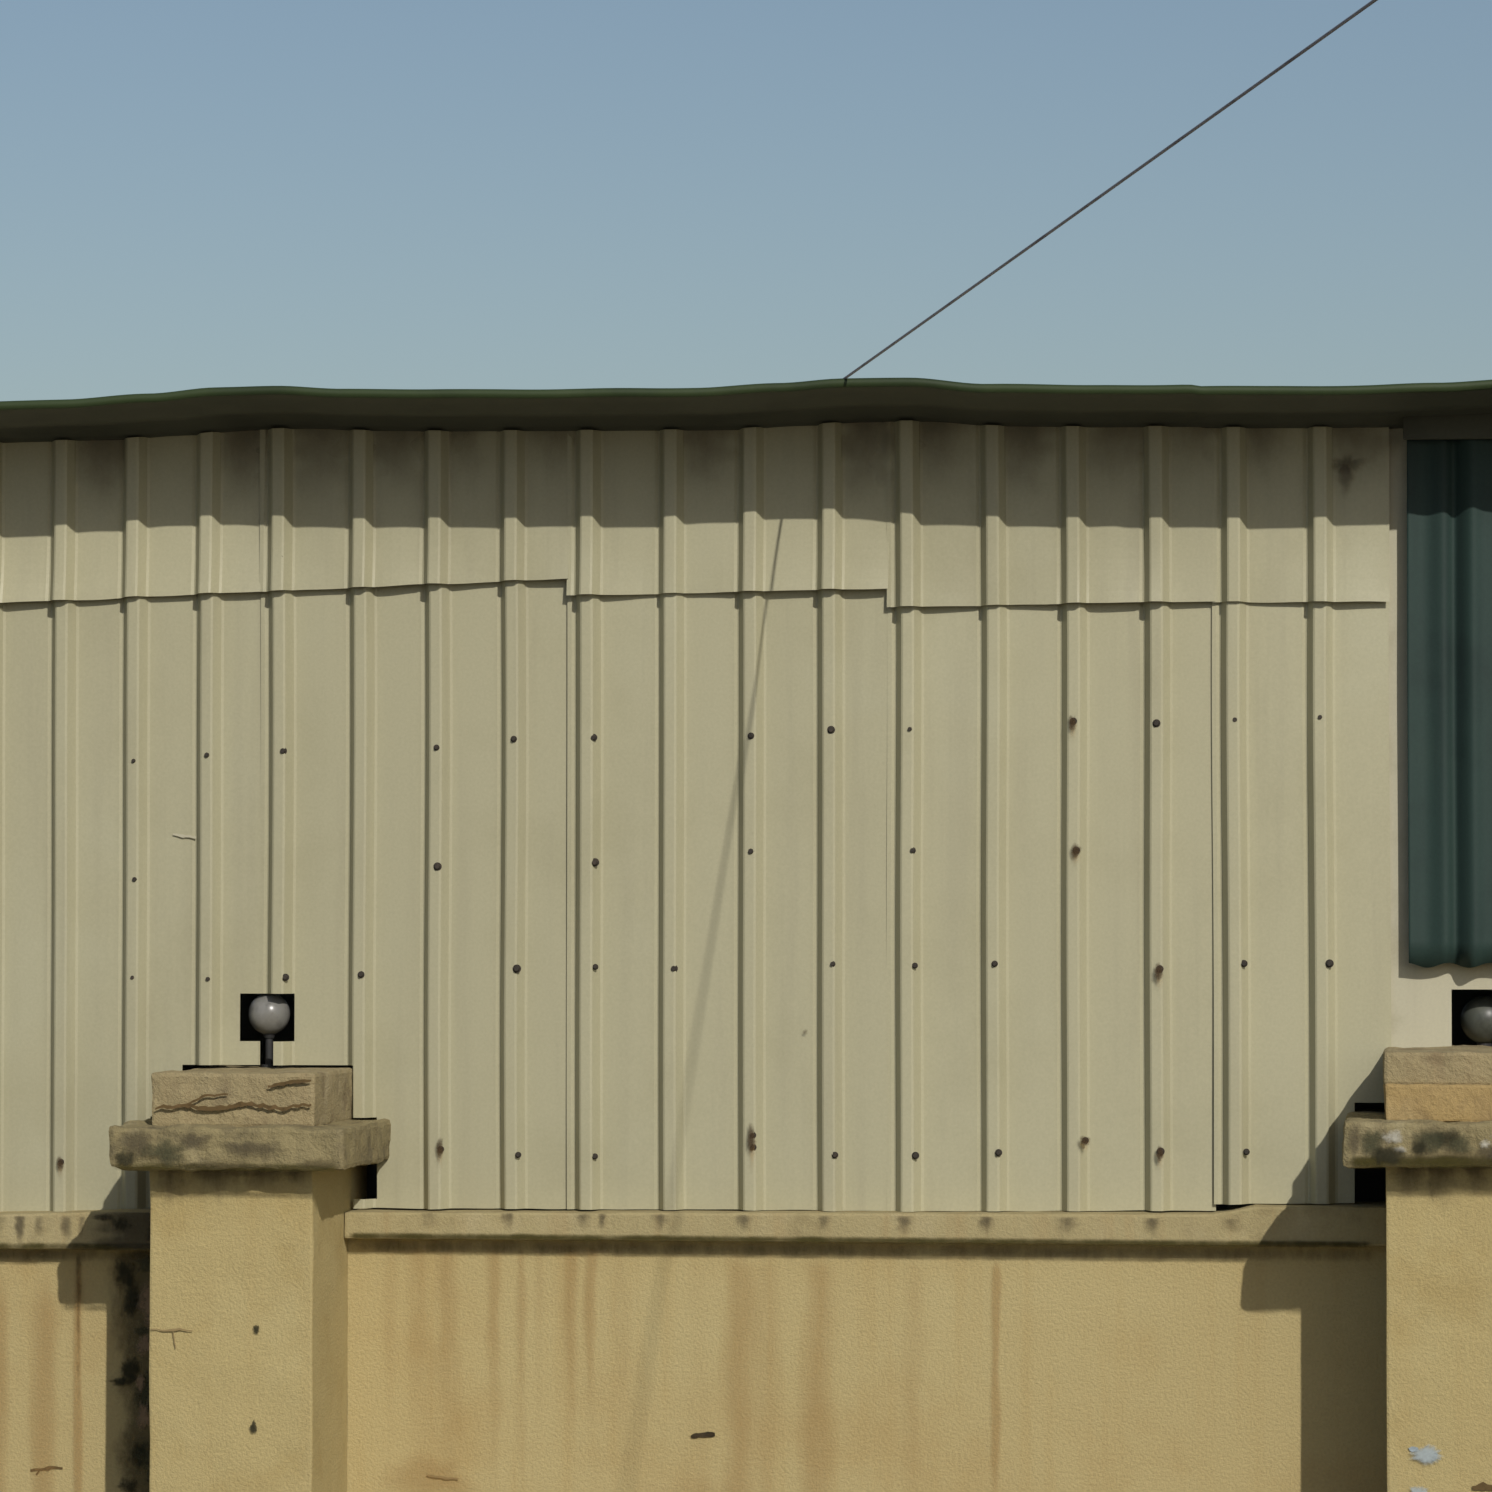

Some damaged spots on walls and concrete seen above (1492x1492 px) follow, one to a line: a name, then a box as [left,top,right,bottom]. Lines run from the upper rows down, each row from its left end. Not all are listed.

damp [116,1136,334,1177]
damp [1351,1130,1492,1174]
damp [0,1213,151,1492]
peeling [1409,1446,1440,1463]